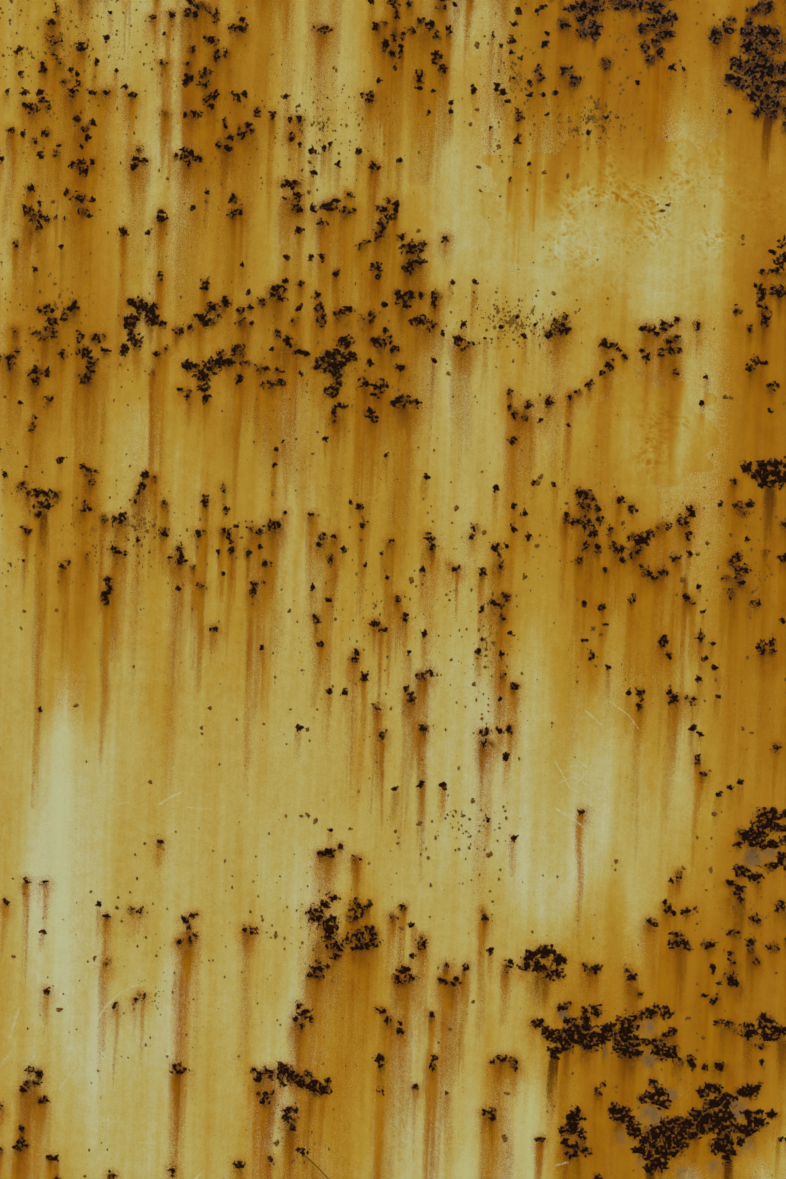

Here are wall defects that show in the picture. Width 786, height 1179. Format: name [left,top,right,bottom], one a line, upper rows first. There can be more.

rust [223,309,710,1179]
rust [494,234,786,1179]